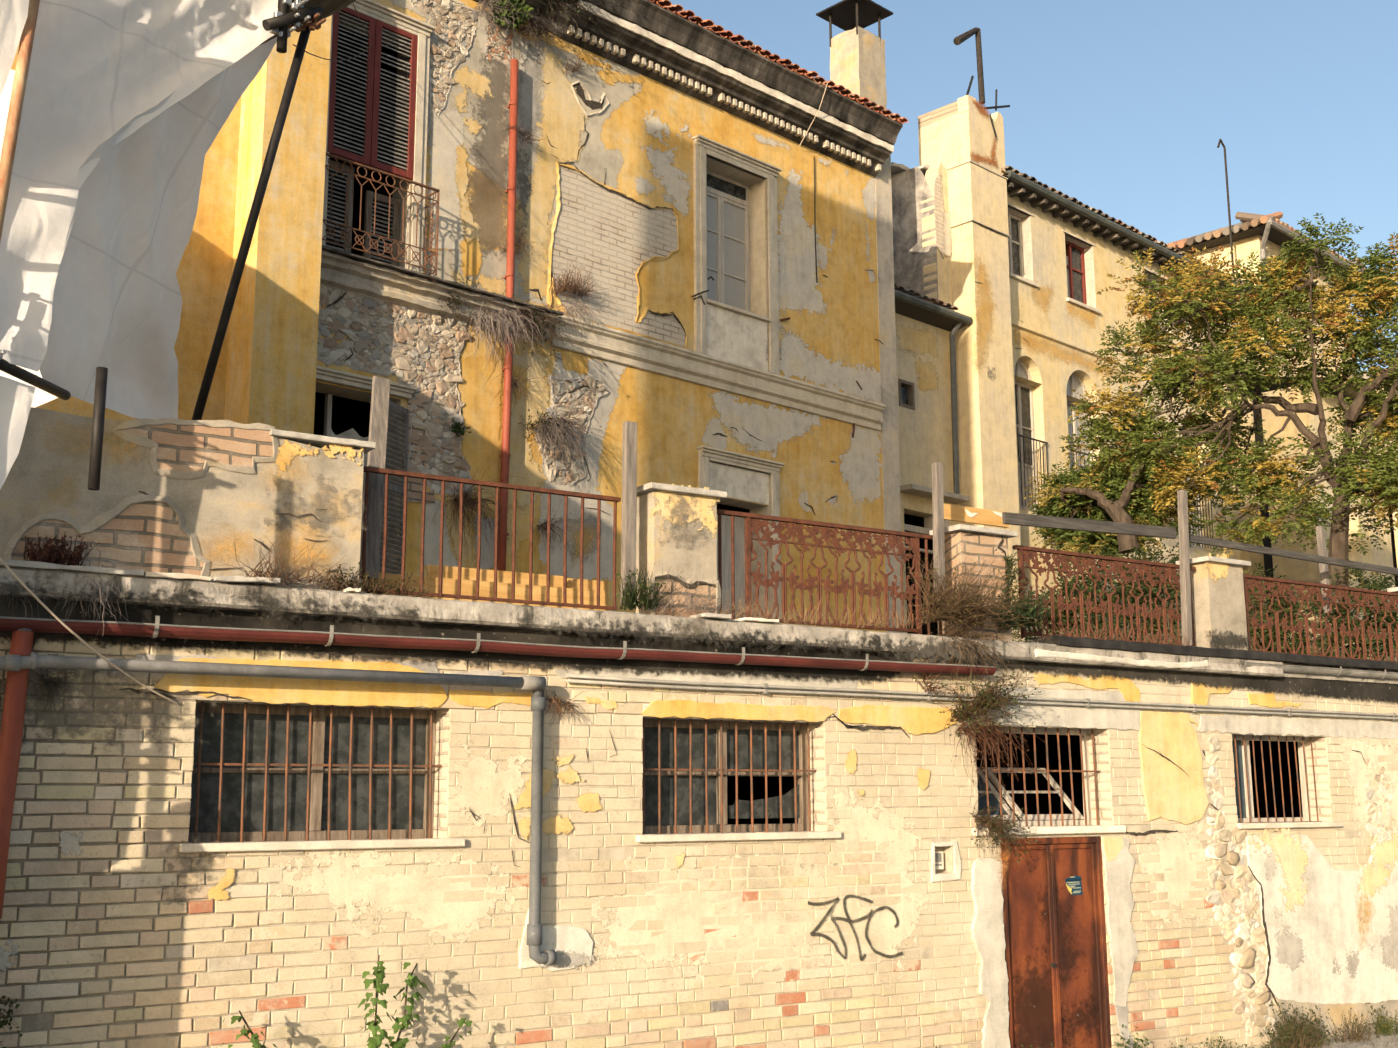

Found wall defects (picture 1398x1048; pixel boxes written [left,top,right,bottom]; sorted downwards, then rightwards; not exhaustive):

spalling [390,0,693,349]
flaking render [751,132,792,151]
peeling [778,168,881,403]
spalling [111,418,364,480]
flaking render [701,390,827,458]
flaking render [828,425,883,506]
spalling [3,494,211,577]
peeling [1339,736,1398,899]
rust [1013,894,1099,1048]
peeling [1332,906,1398,983]